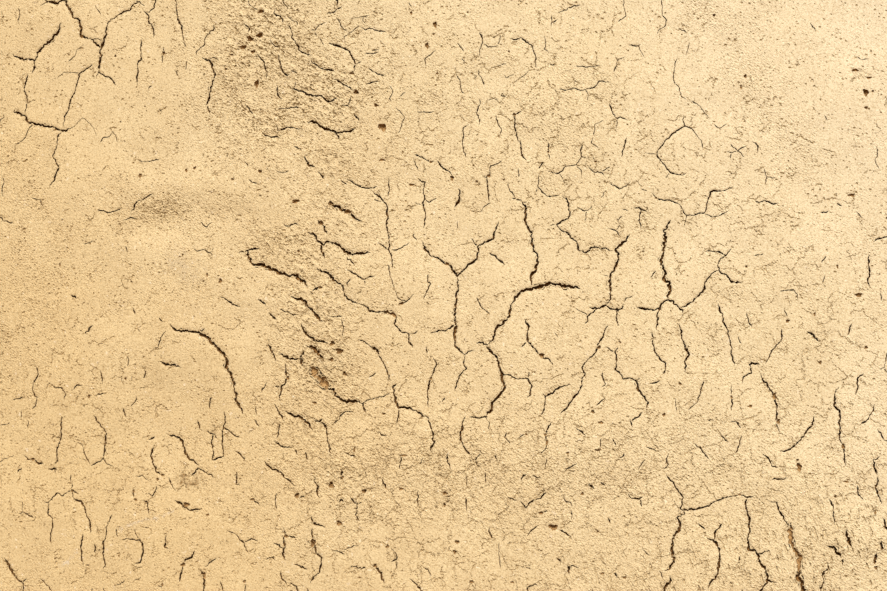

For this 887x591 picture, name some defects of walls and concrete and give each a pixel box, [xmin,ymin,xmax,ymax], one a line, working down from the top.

crack [0,0,219,207]
crack [122,0,815,591]
crack [807,331,820,342]
crack [820,202,862,219]
crack [866,235,887,300]
crack [873,146,881,170]
crack [0,366,247,591]
crack [832,352,887,564]